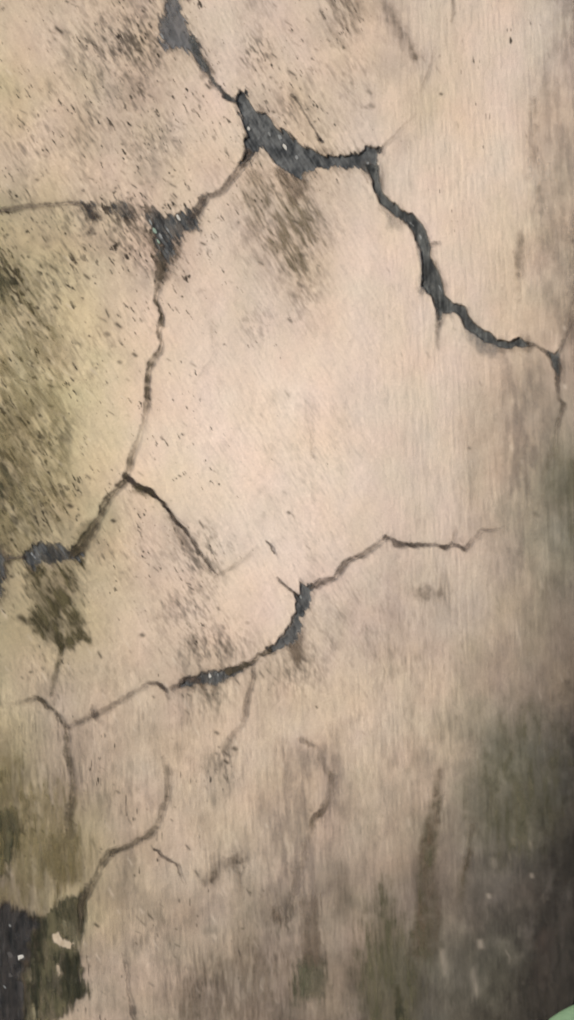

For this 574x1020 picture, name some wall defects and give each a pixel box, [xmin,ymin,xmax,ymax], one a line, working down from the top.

crack [188,35,240,105]
crack [0,201,95,234]
crack [191,148,253,216]
crack [144,253,165,411]
crack [365,149,565,421]
crack [68,453,215,573]
crack [278,529,485,596]
crack [225,648,272,715]
crack [28,676,200,821]
crack [77,788,180,931]
leakage [421,790,440,874]
leakage [518,831,574,1020]